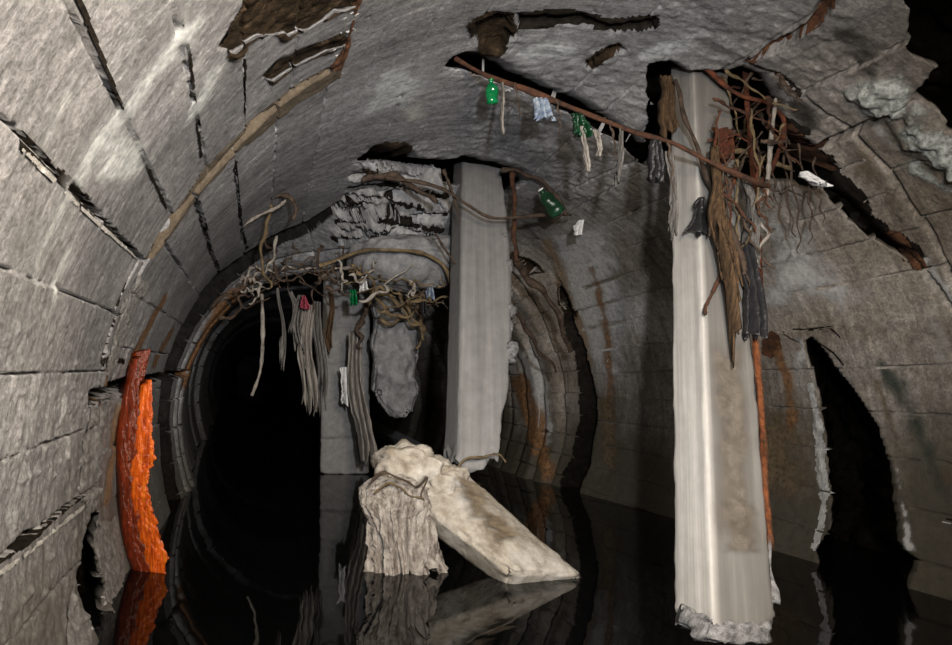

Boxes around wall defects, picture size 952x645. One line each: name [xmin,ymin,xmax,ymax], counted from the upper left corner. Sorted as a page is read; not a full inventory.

water stain [35,18,204,269]
water stain [185,64,224,123]
spalling [220,0,362,85]
spalling [460,8,661,69]
crack [729,0,952,302]
water stain [844,50,952,193]
rust [104,294,174,574]
rust [512,373,556,479]
rust [596,284,620,469]
crack [782,326,844,366]
spalling [94,516,126,606]
spalling [66,584,94,645]